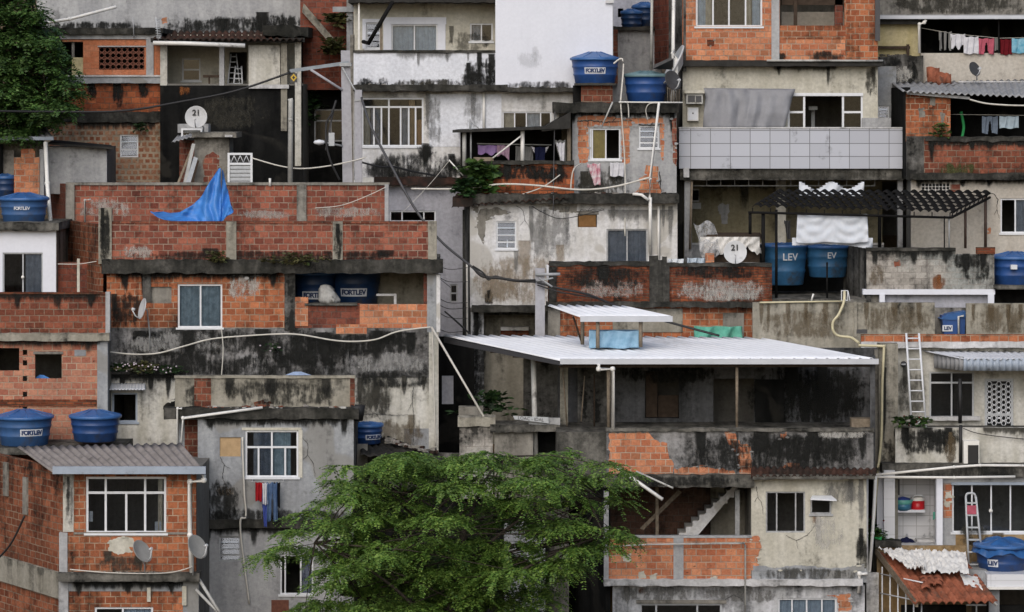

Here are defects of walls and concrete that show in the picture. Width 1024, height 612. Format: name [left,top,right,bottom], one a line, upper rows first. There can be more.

leakage [358,26,495,178]
flaking render [577,114,679,193]
leakage [236,224,407,260]
leakage [571,265,645,288]
leakage [609,204,673,233]
leakage [679,266,759,278]
leakage [870,250,992,284]
leakage [0,248,429,445]
leakage [882,366,959,462]
flaking render [607,431,754,475]
leakage [615,367,867,579]
leakage [209,482,344,544]